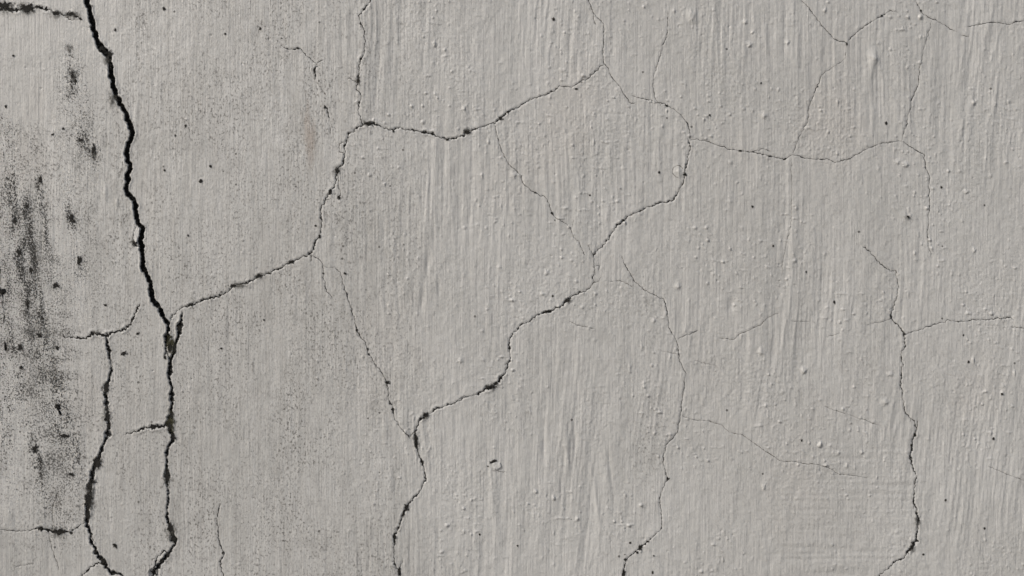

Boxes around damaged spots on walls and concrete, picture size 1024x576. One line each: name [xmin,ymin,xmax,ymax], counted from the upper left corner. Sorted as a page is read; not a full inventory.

crack [0,1,82,20]
crack [807,6,891,55]
crack [917,4,1020,46]
crack [886,123,930,238]
crack [84,0,878,576]
crack [1,304,140,576]
crack [863,247,1022,576]